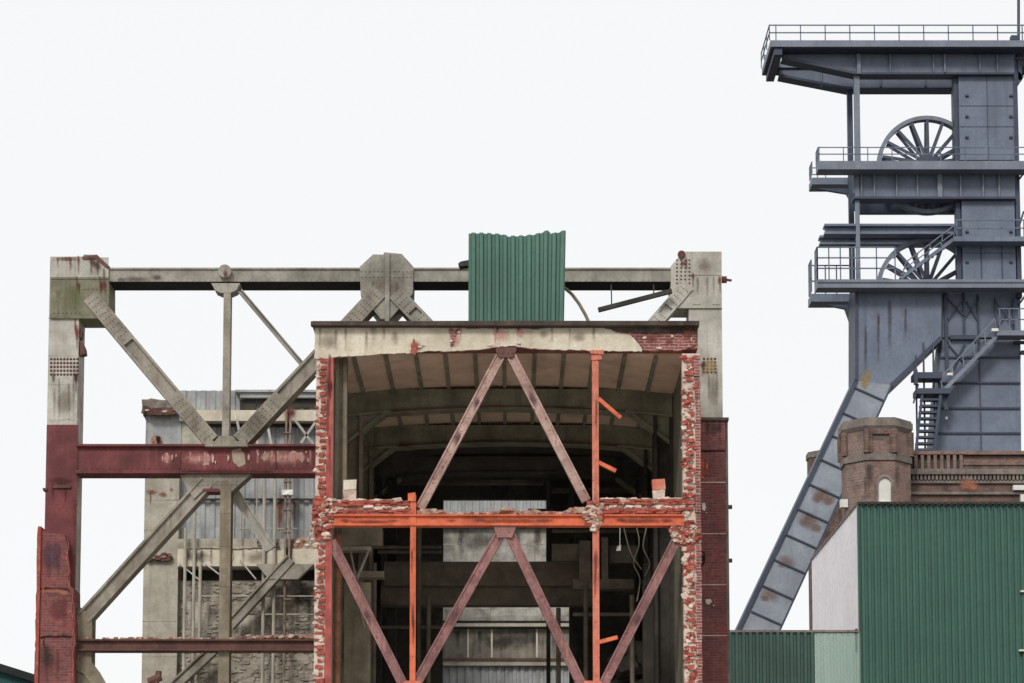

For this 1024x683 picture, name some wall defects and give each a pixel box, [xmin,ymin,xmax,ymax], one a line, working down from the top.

corrosion [57,256,106,292]
spalling [613,330,697,352]
peeling [199,448,309,467]
spalling [666,523,705,567]